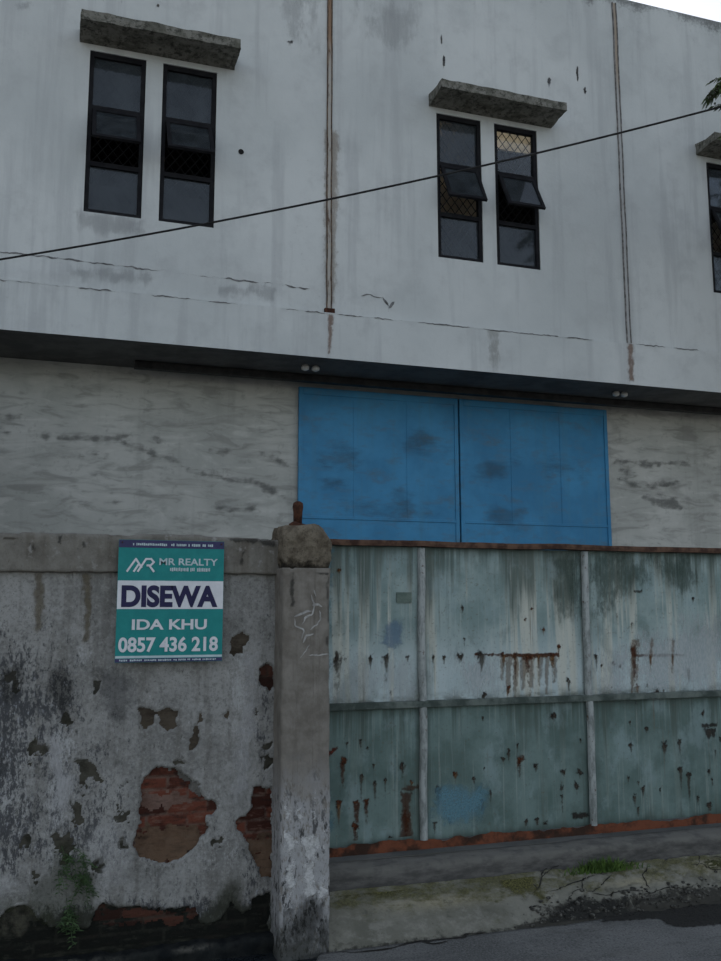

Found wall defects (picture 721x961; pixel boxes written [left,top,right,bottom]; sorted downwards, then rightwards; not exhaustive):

flaking render [229,631,249,656]
corrosion [475,644,561,672]
corrosion [630,646,684,692]
flaking render [137,707,178,731]
corrosion [329,739,368,782]
flaking render [113,760,224,863]
flaking render [236,786,272,877]
corrosion [336,774,387,837]
corrosion [389,762,419,838]
peeling [284,831,328,898]
crack [533,853,721,902]
flaking render [0,892,271,961]